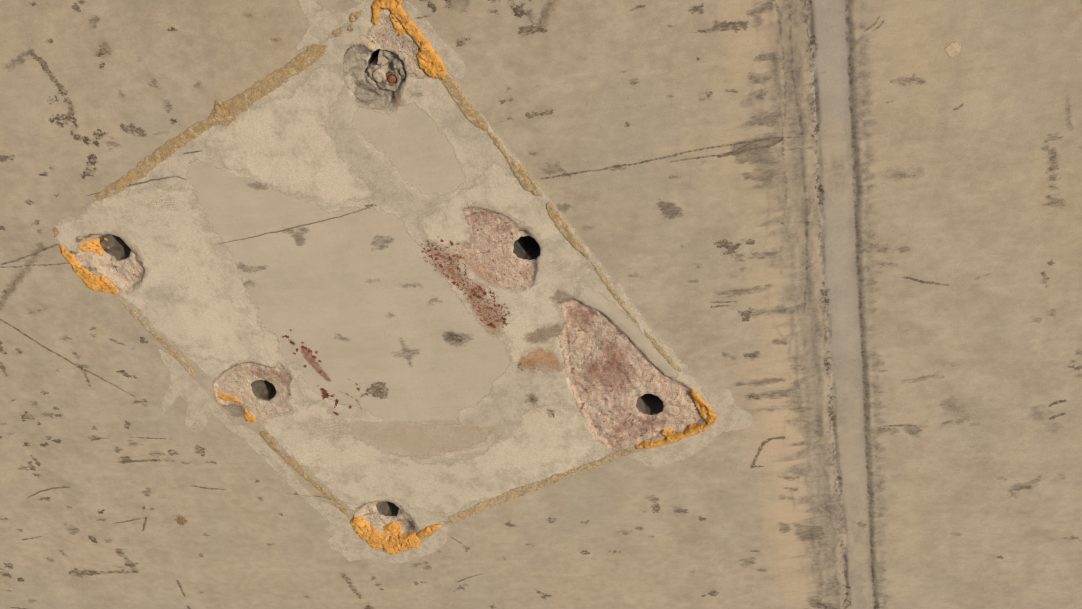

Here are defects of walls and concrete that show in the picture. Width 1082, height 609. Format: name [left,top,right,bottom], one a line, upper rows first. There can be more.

spalling [69,233,144,294]
corrosion [421,236,510,333]
spalling [462,206,542,290]
crack [545,3,841,491]
spalling [213,362,293,420]
corrosion [282,329,360,415]
spalling [529,291,704,450]
spalling [353,500,417,536]